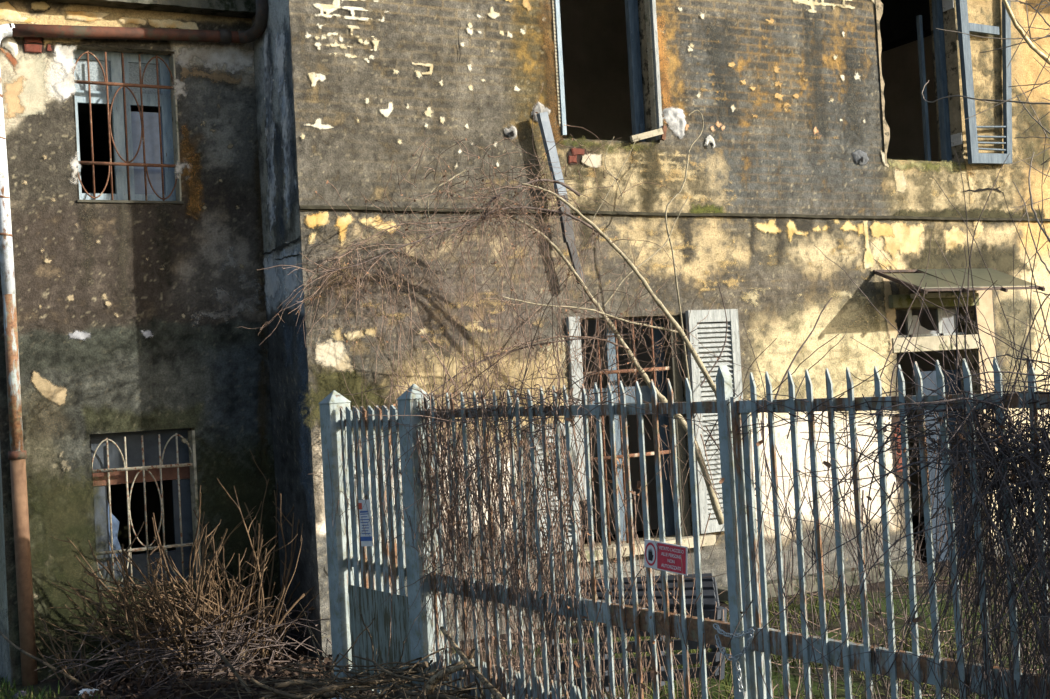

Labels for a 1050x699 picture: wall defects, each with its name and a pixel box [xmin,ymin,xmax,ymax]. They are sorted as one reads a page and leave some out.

peeling [1,36,76,118]
peeling [306,0,388,63]
damp [804,9,828,139]
peeling [173,31,332,241]
damp [256,20,297,251]
damp [581,145,604,250]
damp [644,145,659,213]
damp [679,216,695,263]
peeling [833,221,924,356]
damp [750,42,1048,269]
peeling [32,371,67,433]
peeling [315,327,377,372]